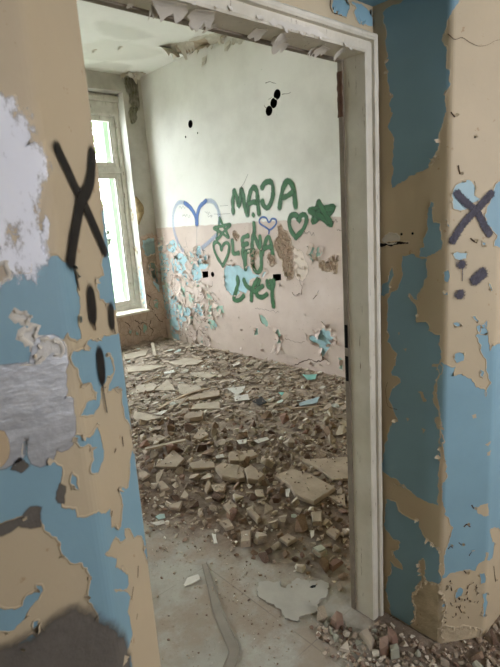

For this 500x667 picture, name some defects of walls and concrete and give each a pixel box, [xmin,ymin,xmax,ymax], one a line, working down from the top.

peeling [148,0,352,67]
peeling [331,0,460,189]
peeling [0,253,132,475]
peeling [95,204,117,313]
peeling [133,237,225,346]
peeling [223,224,338,298]
peeling [305,321,337,366]
peeling [450,165,481,212]
peeling [470,180,500,249]
peeling [380,201,500,644]
peeling [0,441,148,667]